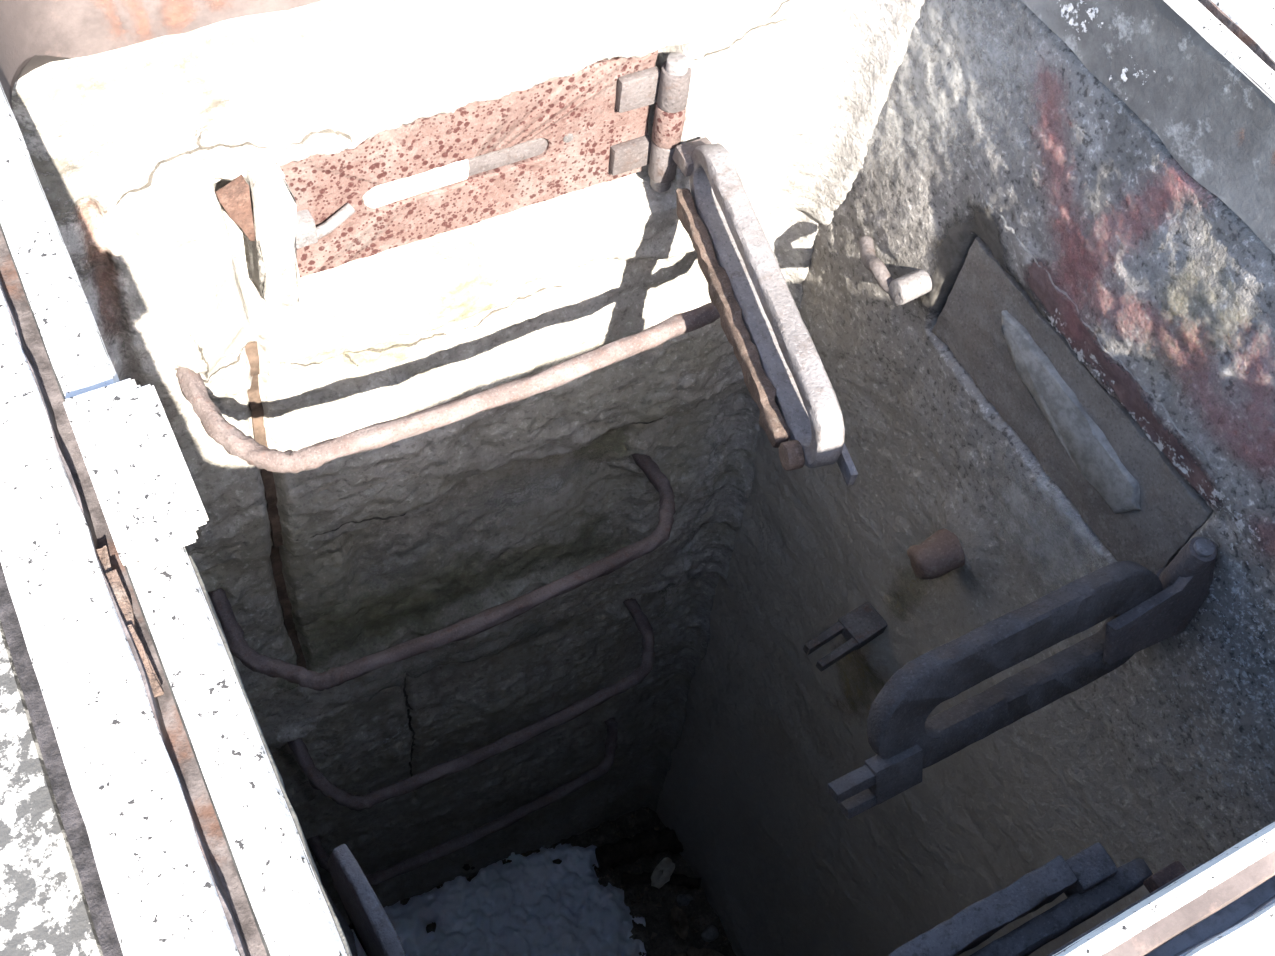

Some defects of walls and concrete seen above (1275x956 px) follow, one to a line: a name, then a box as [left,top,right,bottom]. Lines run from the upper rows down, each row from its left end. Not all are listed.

crack [116,129,352,205]
crack [403,673,415,793]